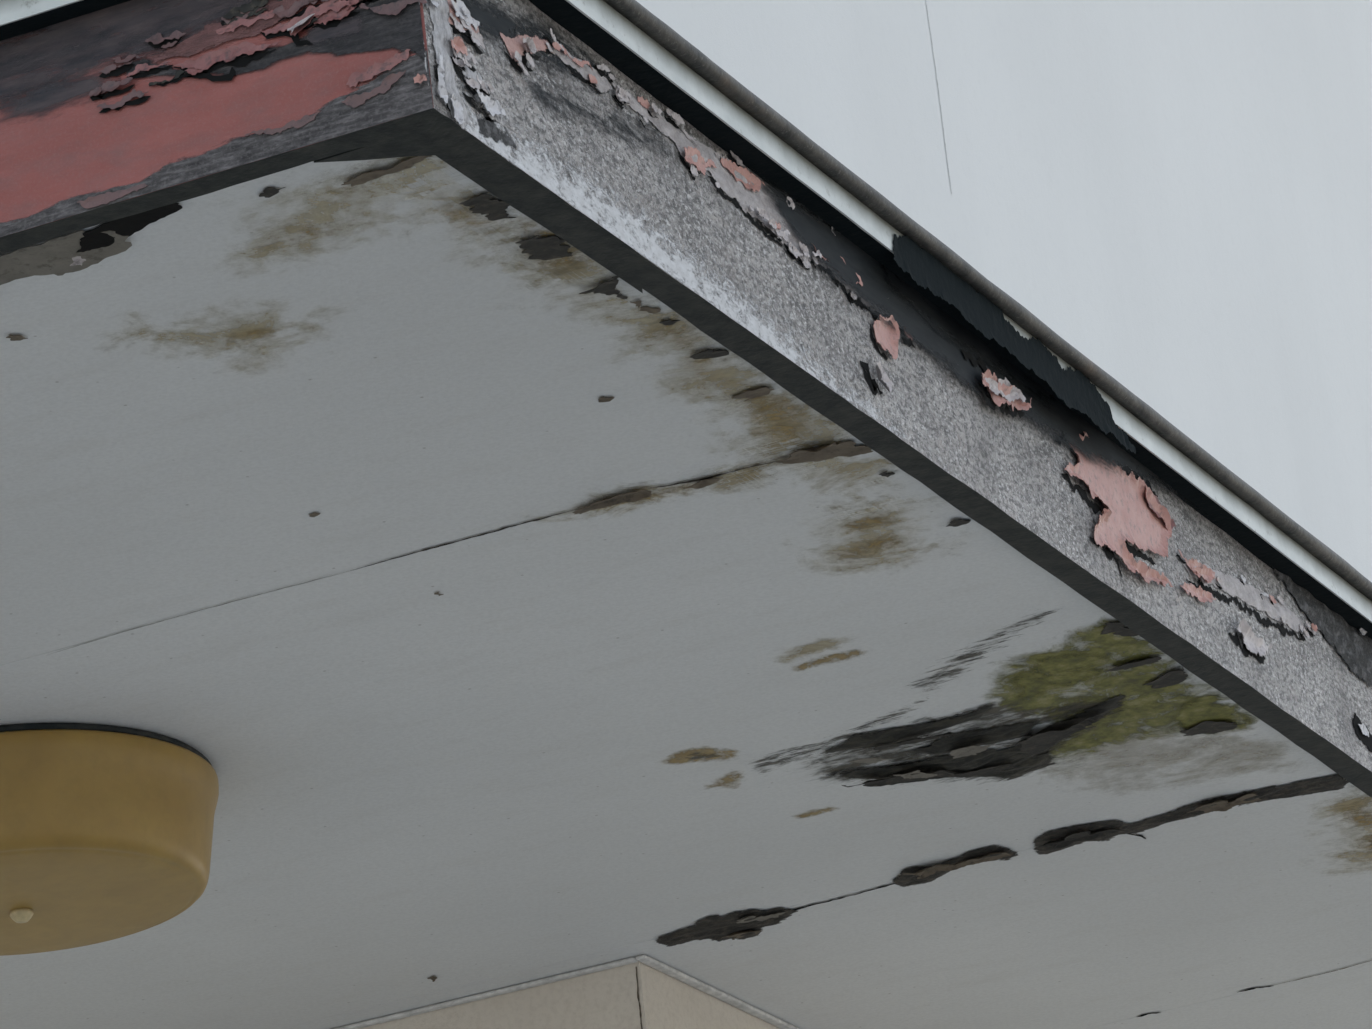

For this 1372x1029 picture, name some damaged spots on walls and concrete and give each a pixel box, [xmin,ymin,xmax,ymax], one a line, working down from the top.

peeling [0,0,510,285]
leakage [243,156,515,258]
peeling [500,28,915,396]
leakage [139,318,274,355]
peeling [961,349,1032,418]
crack [58,461,776,652]
leakage [833,503,913,571]
peeling [1055,431,1317,664]
crack [1239,960,1372,992]